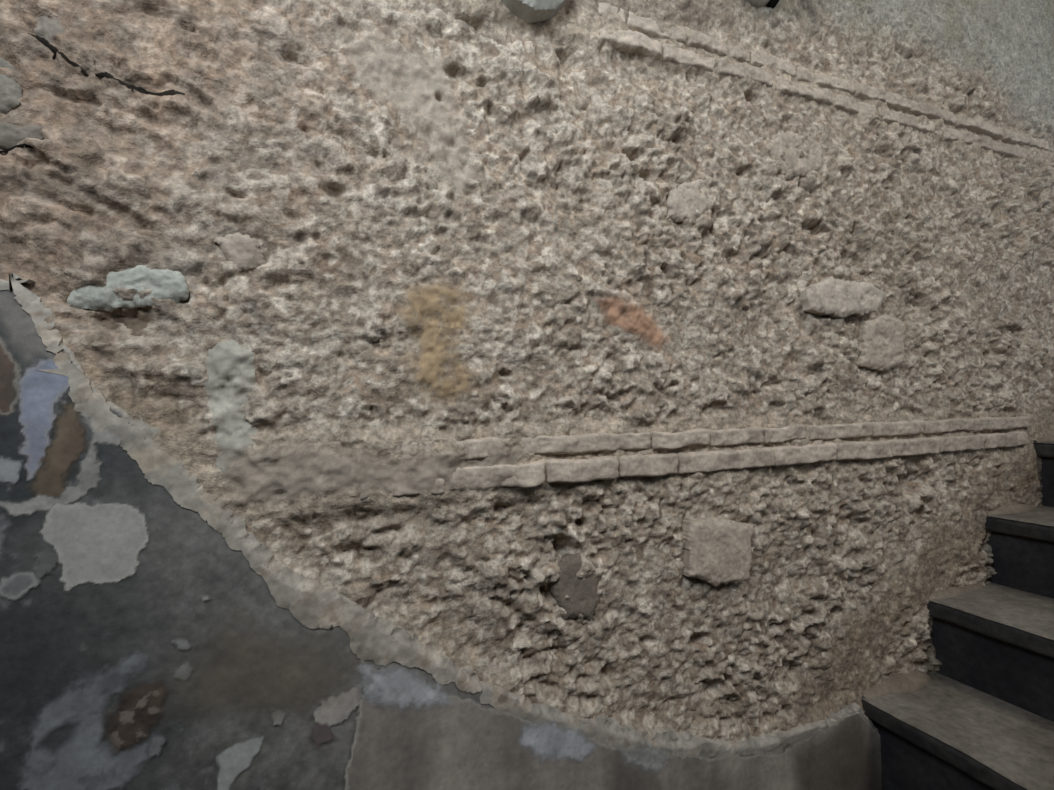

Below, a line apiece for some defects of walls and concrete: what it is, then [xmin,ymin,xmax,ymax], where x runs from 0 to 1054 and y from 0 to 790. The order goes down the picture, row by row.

spalling [34,15,65,43]
spalling [0,74,23,114]
crack [27,33,185,96]
spalling [0,121,44,151]
spalling [765,131,824,180]
water stain [404,284,470,397]
rust [598,295,667,346]
spalling [0,265,206,517]
peeling [0,413,149,600]
spalling [200,493,482,694]
spalling [548,554,600,620]
peeling [313,684,882,790]